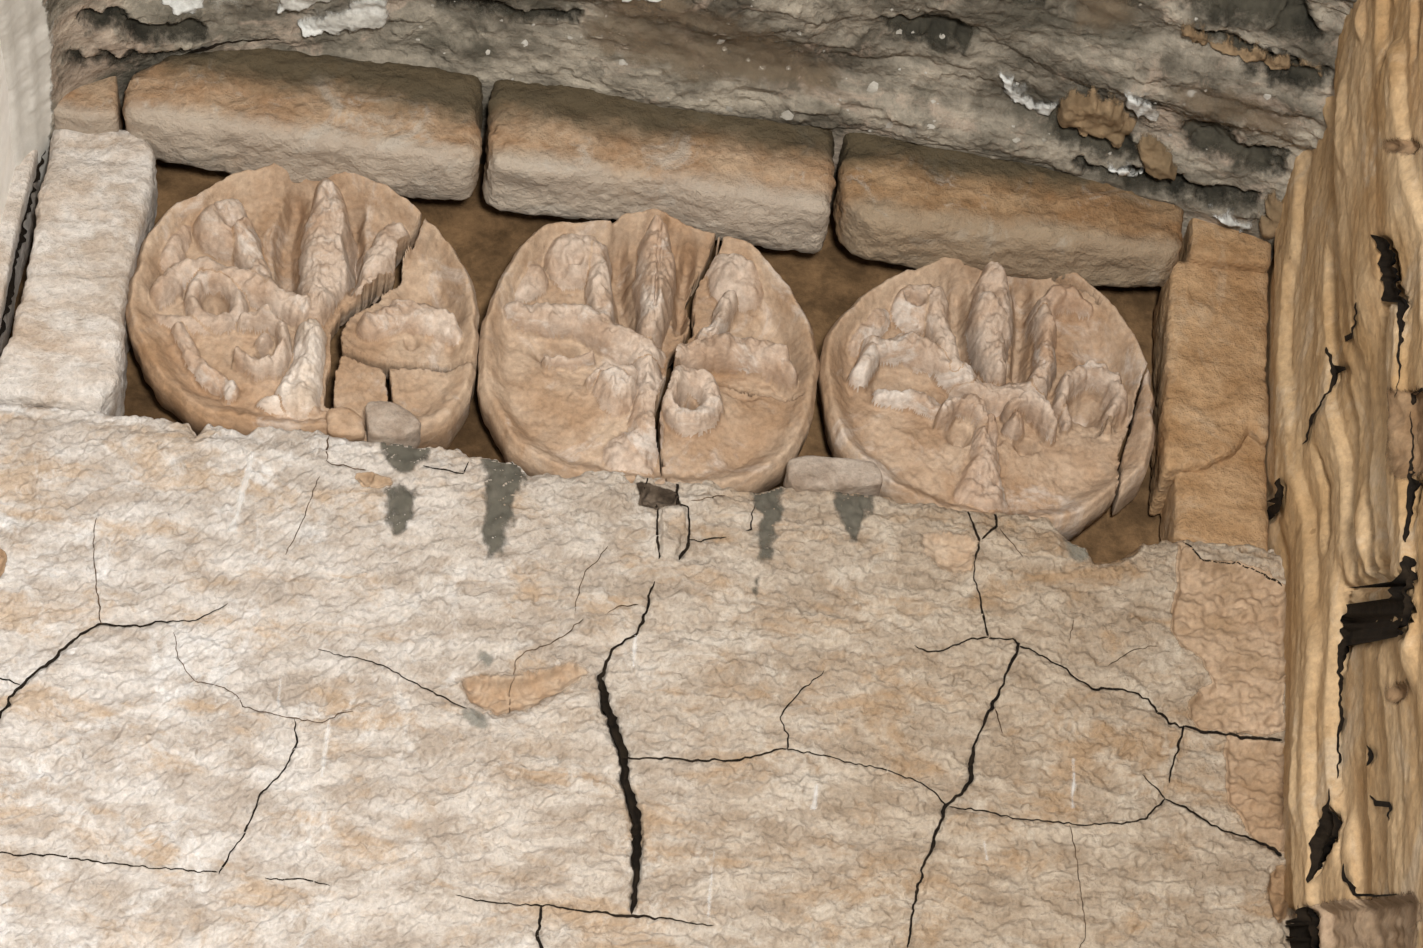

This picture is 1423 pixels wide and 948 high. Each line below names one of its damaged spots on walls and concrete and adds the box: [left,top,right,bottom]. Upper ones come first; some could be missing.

spalling [65,0,207,65]
peeling [277,0,388,38]
spalling [1181,0,1328,88]
peeling [999,73,1290,239]
crack [286,436,365,554]
water stain [381,442,429,535]
water stain [482,458,526,555]
water stain [753,487,783,560]
water stain [834,491,874,541]
crack [509,235,1423,948]
crack [0,518,352,873]
crack [319,649,467,709]